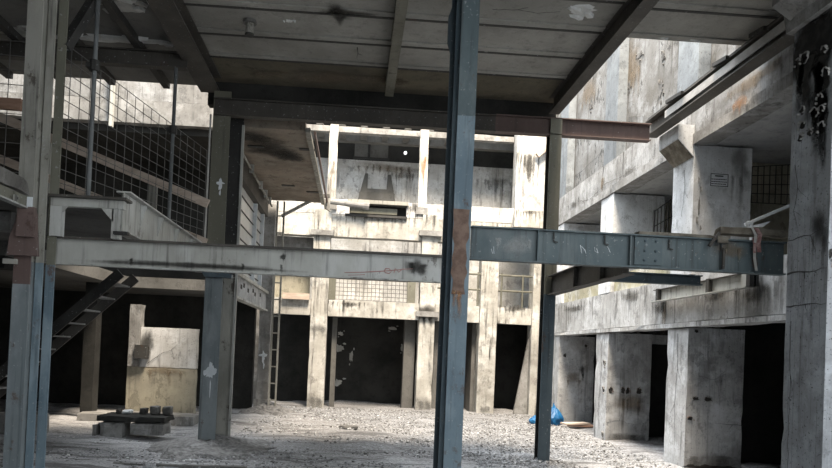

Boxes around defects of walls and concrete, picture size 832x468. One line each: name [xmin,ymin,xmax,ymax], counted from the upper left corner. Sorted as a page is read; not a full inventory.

flaking render [114,0,148,13]
flaking render [568,4,596,21]
spalling [796,66,831,142]
water stain [516,153,539,178]
corrosion [451,209,470,305]